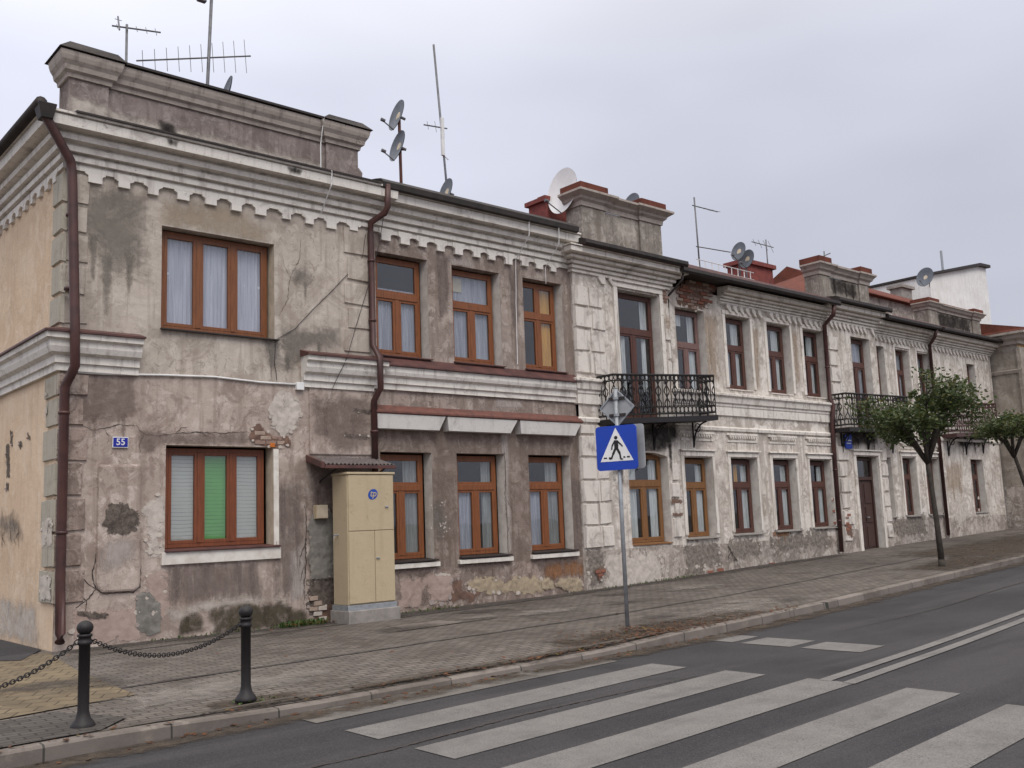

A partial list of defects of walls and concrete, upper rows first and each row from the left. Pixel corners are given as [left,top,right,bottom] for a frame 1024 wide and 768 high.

water stain [86,192,144,309]
flaking render [657,280,717,312]
flaking render [249,390,303,449]
flaking render [4,431,30,492]
flaking render [102,492,166,559]
crack [76,555,96,611]
flaking render [68,571,170,644]
water stain [168,564,269,628]
flaking render [305,578,334,621]
flaking render [397,572,546,610]